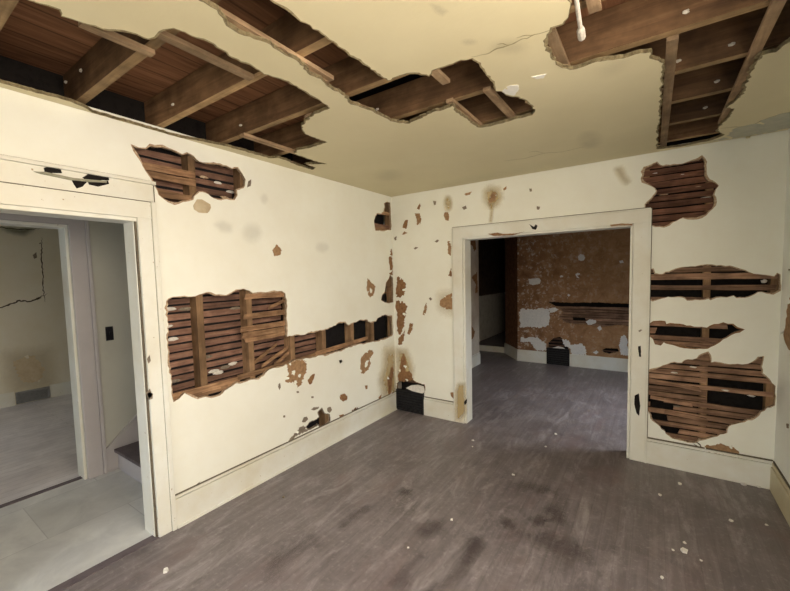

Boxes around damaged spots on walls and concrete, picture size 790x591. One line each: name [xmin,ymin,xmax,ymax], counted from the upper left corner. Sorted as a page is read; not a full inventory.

crack [474,30,549,57]
peeling [503,85,519,96]
peeling [715,112,790,141]
flaking render [131,144,251,205]
flaking render [641,155,719,228]
crack [0,226,46,308]
flaking render [165,202,425,402]
flaking render [548,301,629,327]
flaking render [650,264,790,301]
flaking render [781,297,790,350]
flaking render [648,321,776,458]